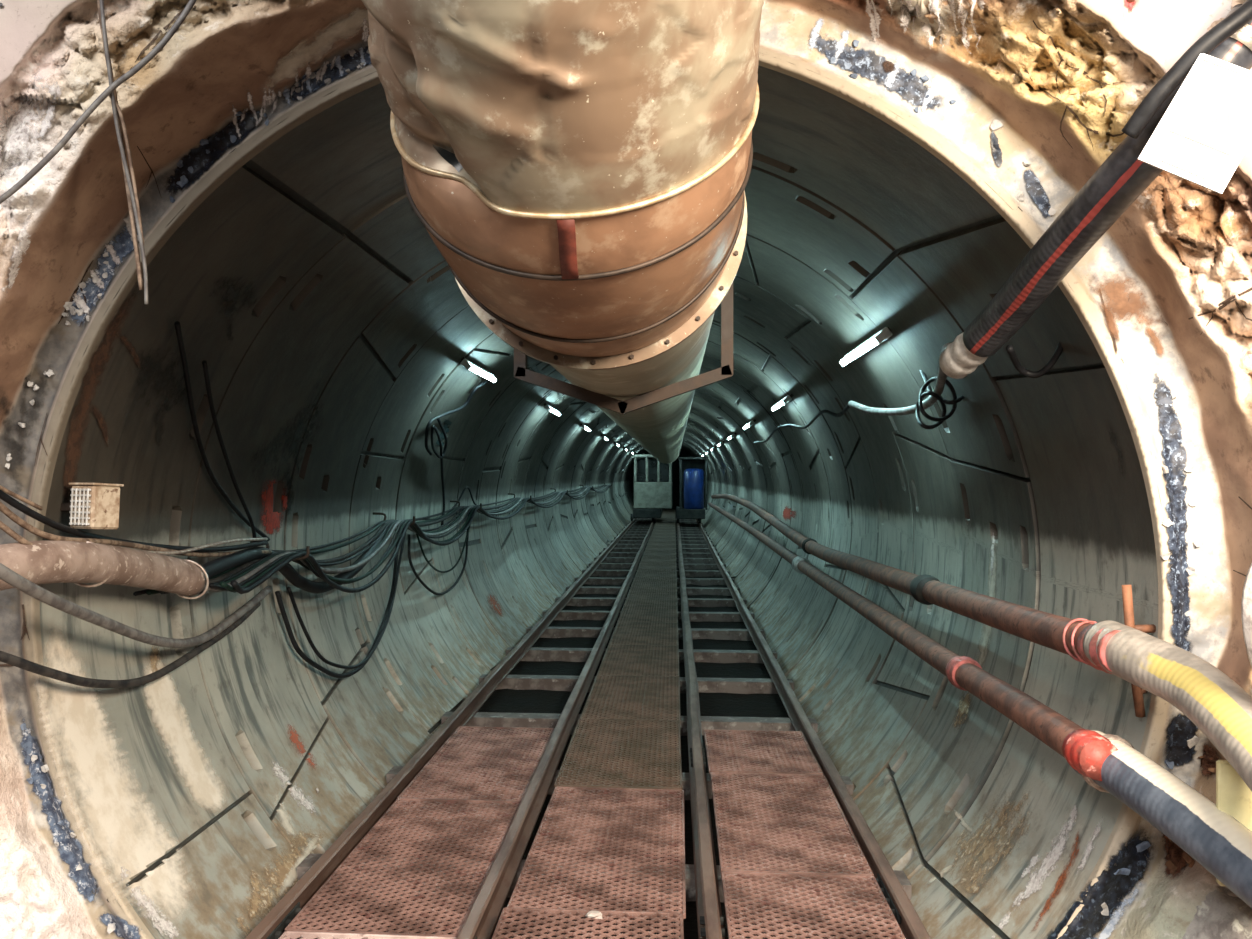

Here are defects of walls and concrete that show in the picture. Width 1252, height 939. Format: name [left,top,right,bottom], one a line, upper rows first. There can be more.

peeling [809,18,957,113]
peeling [166,92,269,203]
peeling [990,119,1004,167]
peeling [1017,159,1056,218]
peeling [62,216,139,326]
peeling [5,369,55,469]
peeling [1154,374,1201,651]
peeling [20,719,99,903]
peeling [100,913,141,939]
damp [992,805,1078,938]
corrosion [1034,833,1079,929]
damp [1078,820,1102,870]